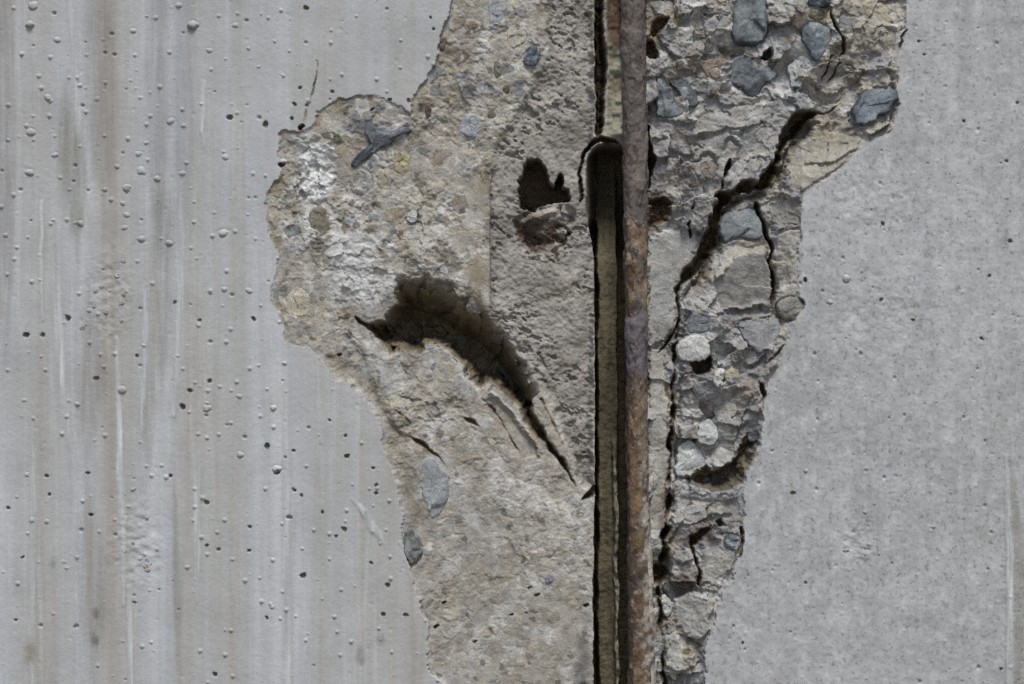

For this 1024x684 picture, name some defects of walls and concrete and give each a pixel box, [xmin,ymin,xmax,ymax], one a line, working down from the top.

crack [577,0,620,204]
corrosion [625,193,668,303]
spalling [263,0,623,684]
crack [653,9,847,684]
spalling [624,0,1024,684]
crack [392,409,449,468]
crack [458,396,579,493]
corrosion [628,396,645,554]
corrosion [633,589,646,684]